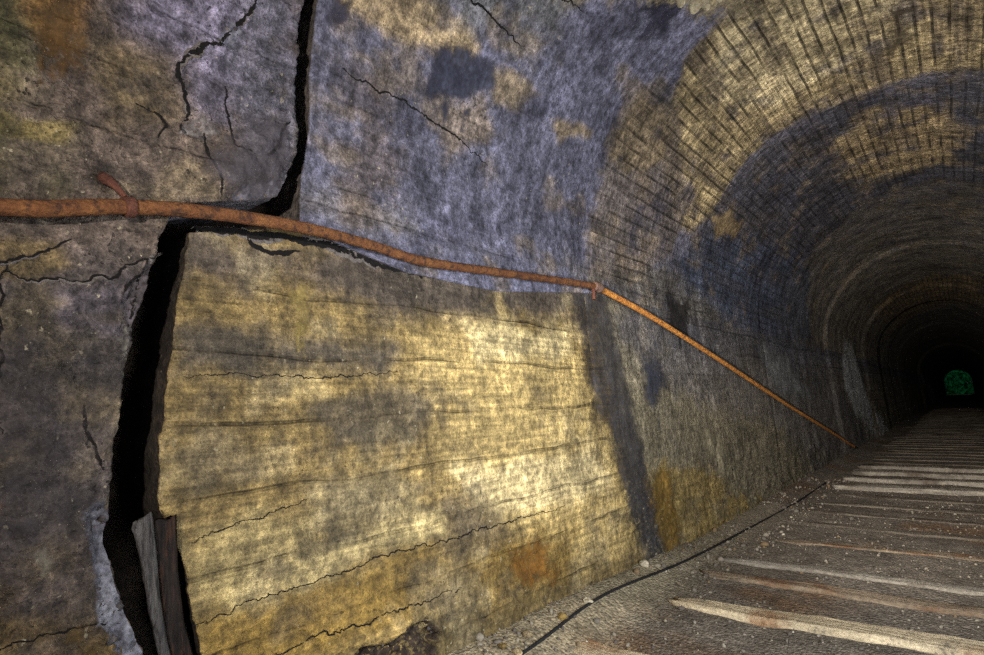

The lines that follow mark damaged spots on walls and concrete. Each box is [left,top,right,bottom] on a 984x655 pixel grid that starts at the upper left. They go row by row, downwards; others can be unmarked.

flaking render [671,0,745,20]
crack [135,0,257,195]
crack [224,86,290,155]
damp [646,362,665,403]
crack [0,202,423,655]
damp [573,293,661,558]
crack [193,506,563,626]
crack [275,587,460,655]
spalling [355,618,439,655]